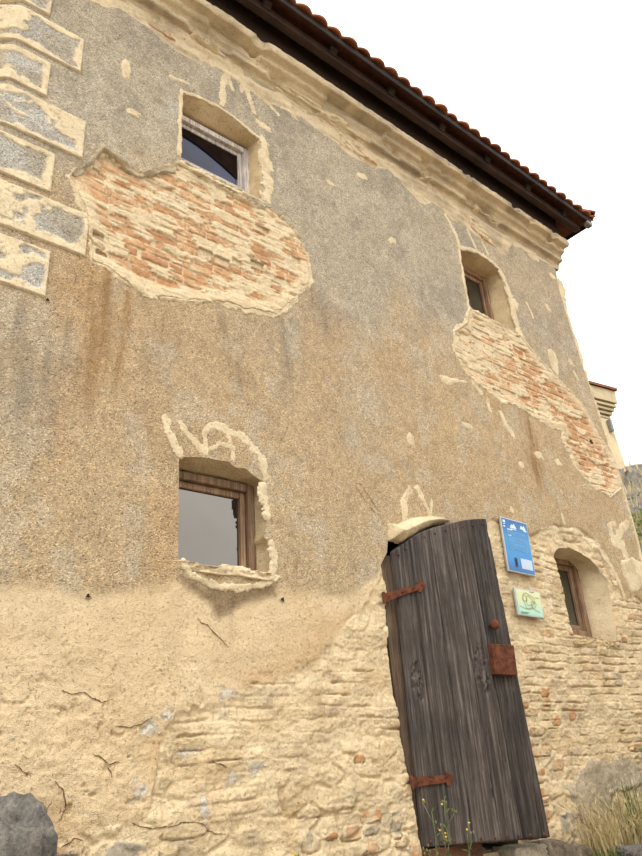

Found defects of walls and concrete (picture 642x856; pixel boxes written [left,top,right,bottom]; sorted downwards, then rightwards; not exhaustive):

flaking render [65,88,315,320]
flaking render [440,245,622,499]
spalling [180,539,280,594]
crack [197,618,228,647]
crack [62,690,110,703]
crack [118,718,151,729]
crack [93,754,118,778]
crack [46,781,67,820]
crack [135,821,226,835]